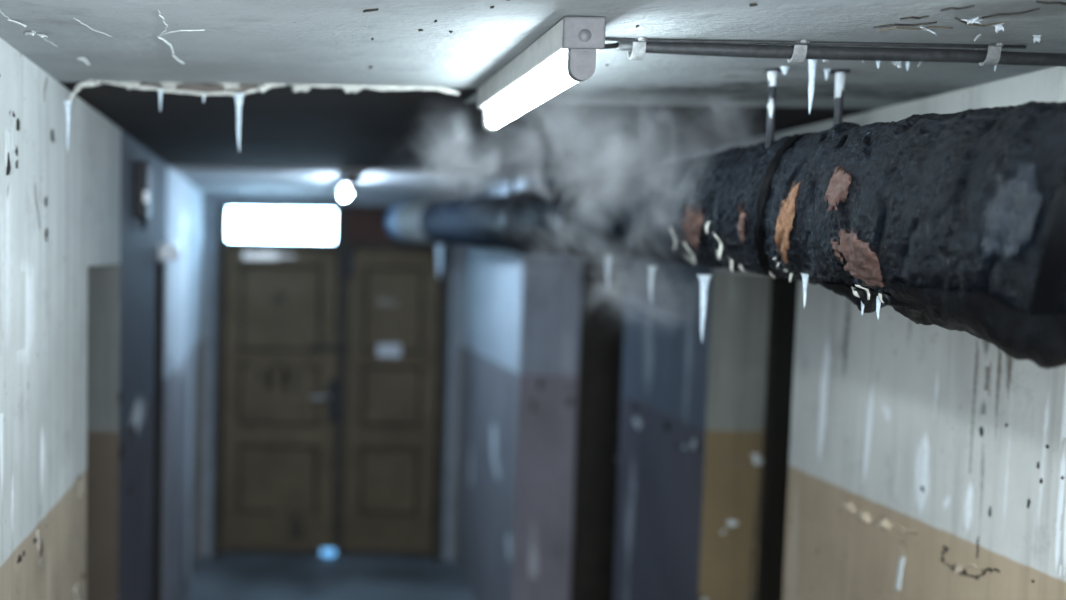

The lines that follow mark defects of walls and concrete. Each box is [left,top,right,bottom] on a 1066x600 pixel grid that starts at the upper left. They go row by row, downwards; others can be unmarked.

crack [157,10,203,64]
peeling [873,0,1066,43]
peeling [941,537,1000,580]